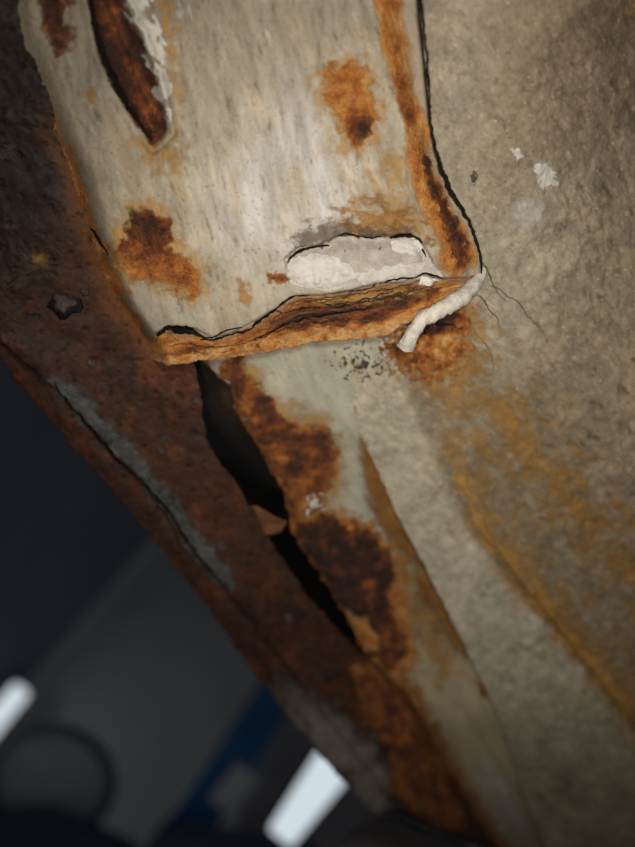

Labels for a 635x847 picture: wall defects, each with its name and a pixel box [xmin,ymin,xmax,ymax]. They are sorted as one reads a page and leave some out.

corrosion [38,0,76,57]
spalling [86,0,183,174]
corrosion [54,0,486,707]
spalling [284,220,443,292]
crack [419,0,540,329]
crack [54,383,226,590]